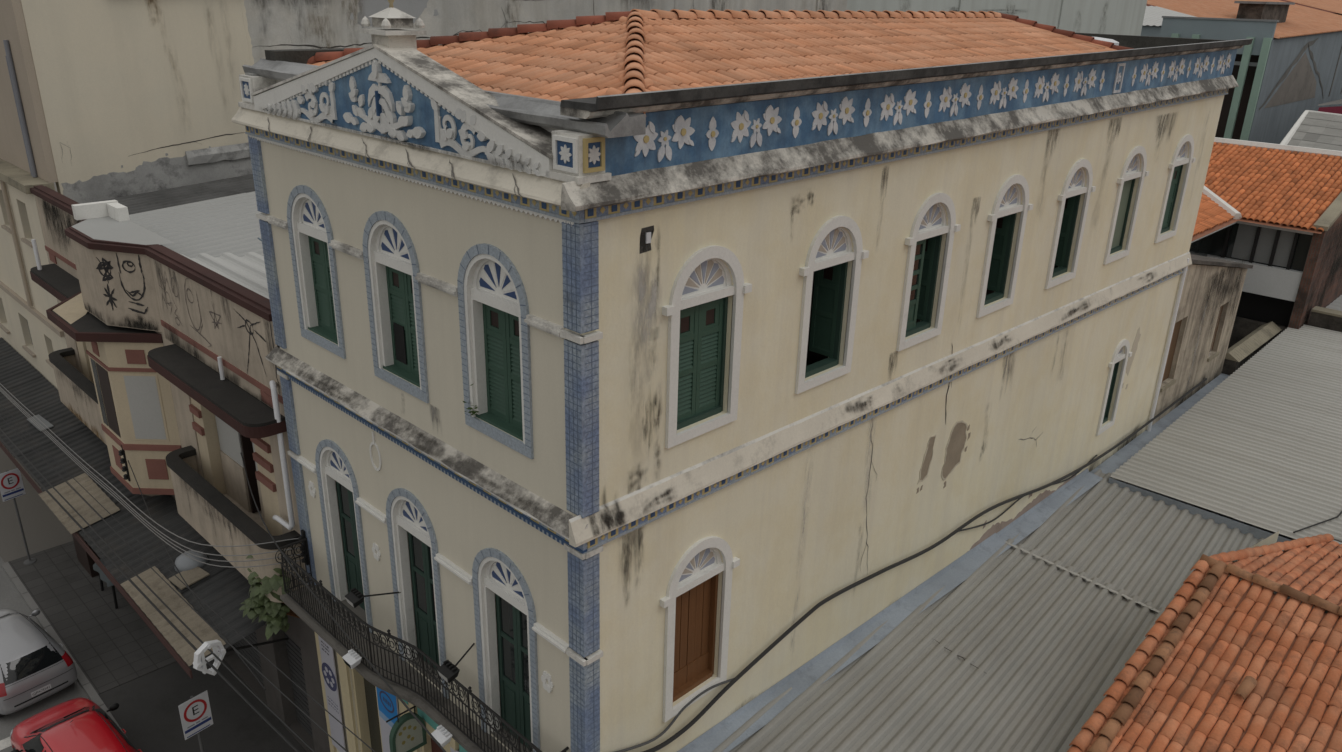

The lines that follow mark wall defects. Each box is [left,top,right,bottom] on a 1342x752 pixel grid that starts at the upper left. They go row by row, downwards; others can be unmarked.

crack [255,37,368,49]
crack [416,0,544,39]
crack [130,120,270,156]
peeling [916,420,971,494]
leakage [590,496,641,573]
crack [860,423,877,576]